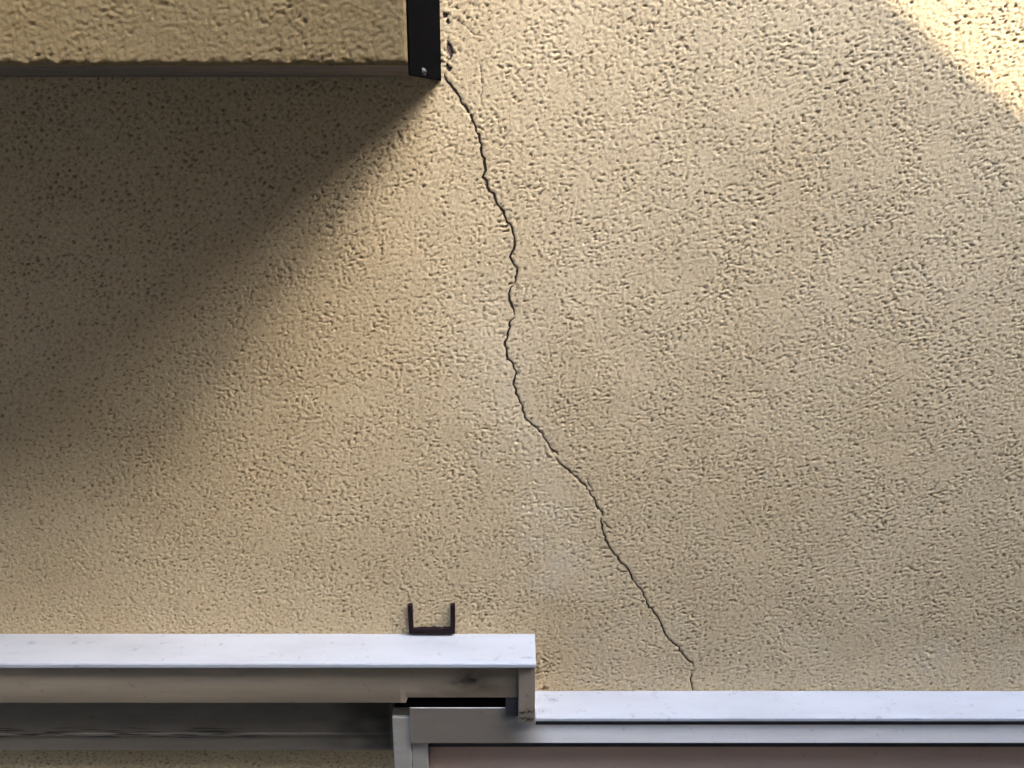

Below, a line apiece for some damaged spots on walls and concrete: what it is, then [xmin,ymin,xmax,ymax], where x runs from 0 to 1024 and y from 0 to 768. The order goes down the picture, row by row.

crack [444,63,695,691]